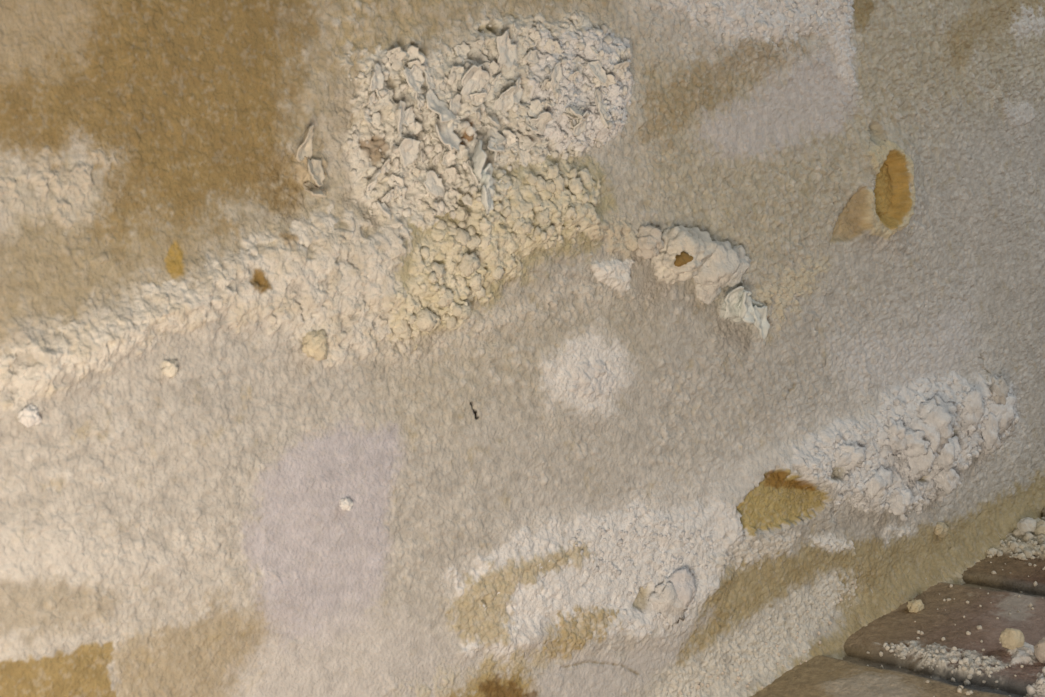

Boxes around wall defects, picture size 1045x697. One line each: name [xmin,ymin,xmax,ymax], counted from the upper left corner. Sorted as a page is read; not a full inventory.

peeling [288,0,636,242]
water stain [0,0,880,437]
flaking render [829,122,917,246]
water stain [371,361,1045,697]
flaking render [736,465,850,539]
water stain [0,575,246,697]
spalling [632,580,654,615]